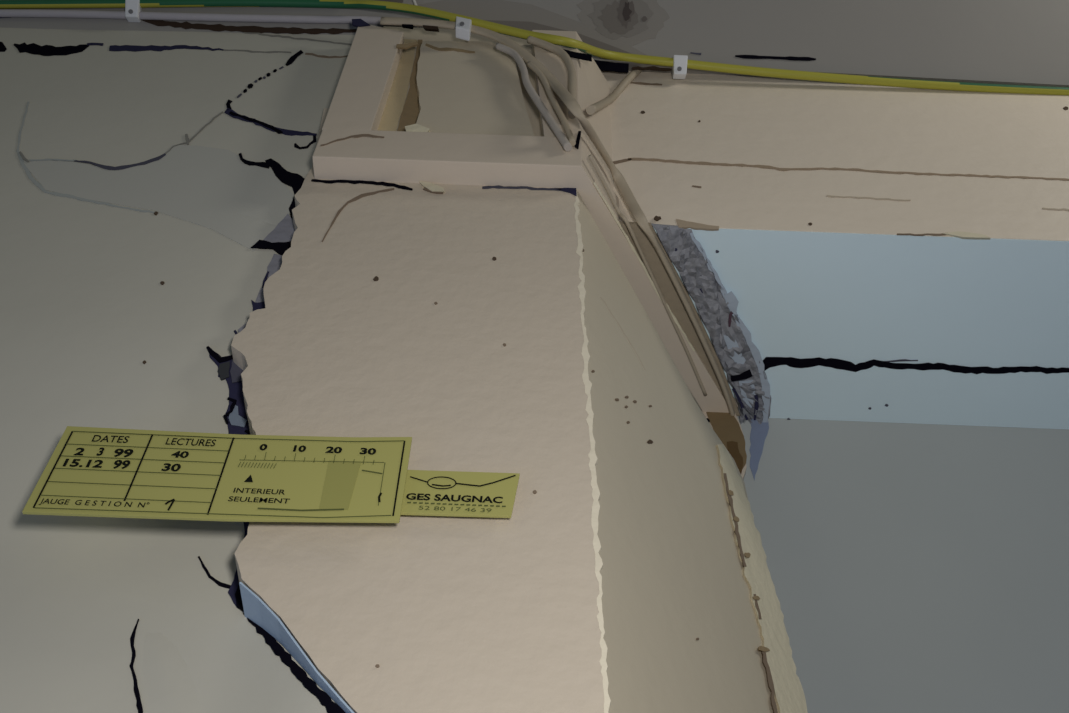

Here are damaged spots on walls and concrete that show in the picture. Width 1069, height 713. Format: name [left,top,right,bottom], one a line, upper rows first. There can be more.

crack [0,17,443,311]
flaking render [651,216,771,424]
crack [207,330,250,435]
crack [731,357,1069,420]
crack [242,522,250,538]
crack [724,473,747,567]
crack [129,619,143,713]
crack [198,556,346,713]
crack [754,594,762,619]
crack [761,651,778,713]